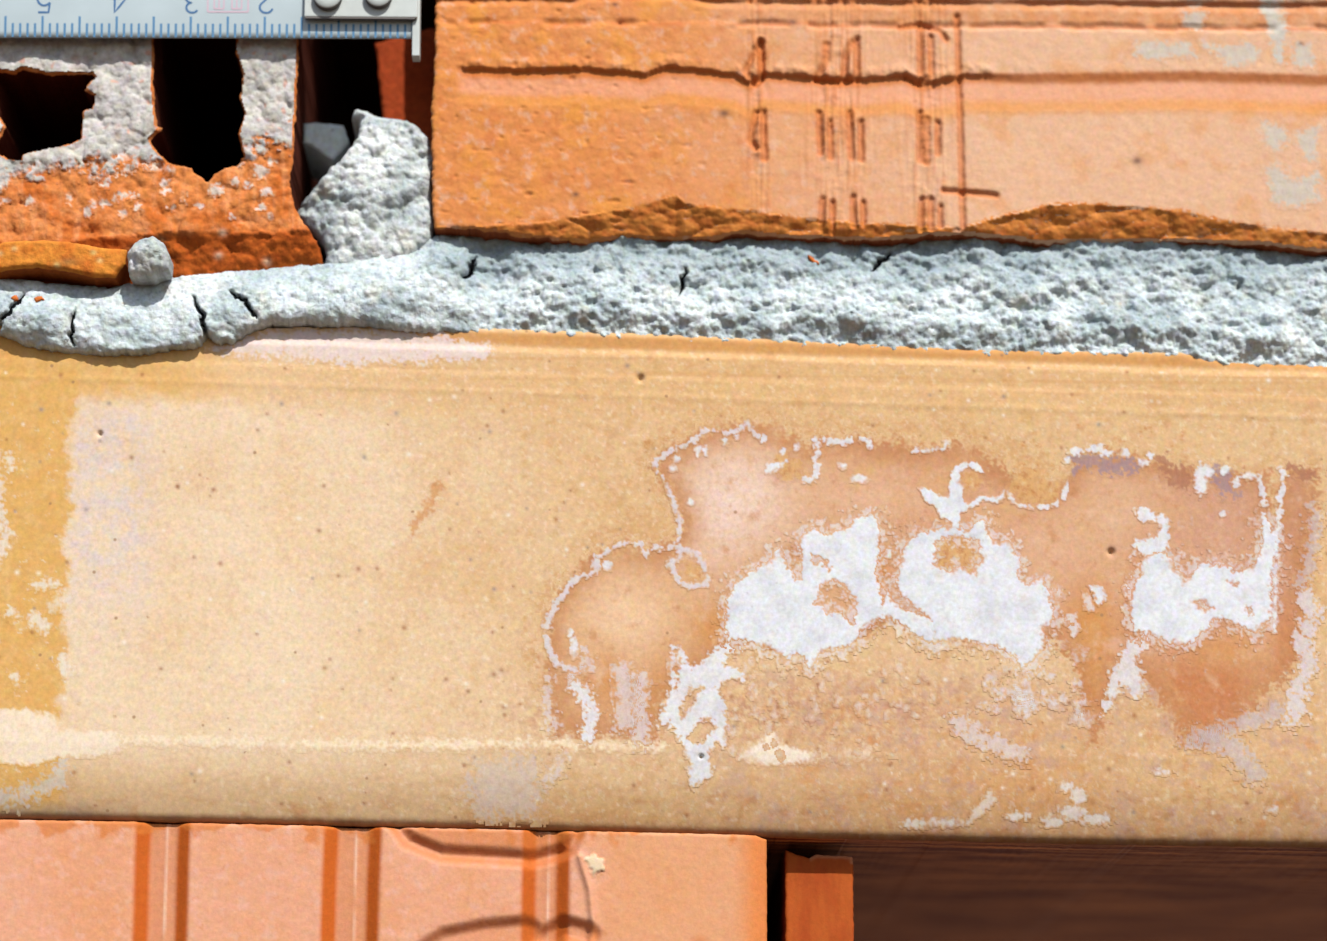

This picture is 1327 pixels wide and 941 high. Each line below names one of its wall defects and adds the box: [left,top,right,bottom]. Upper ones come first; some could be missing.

water stain [449,393,1327,827]